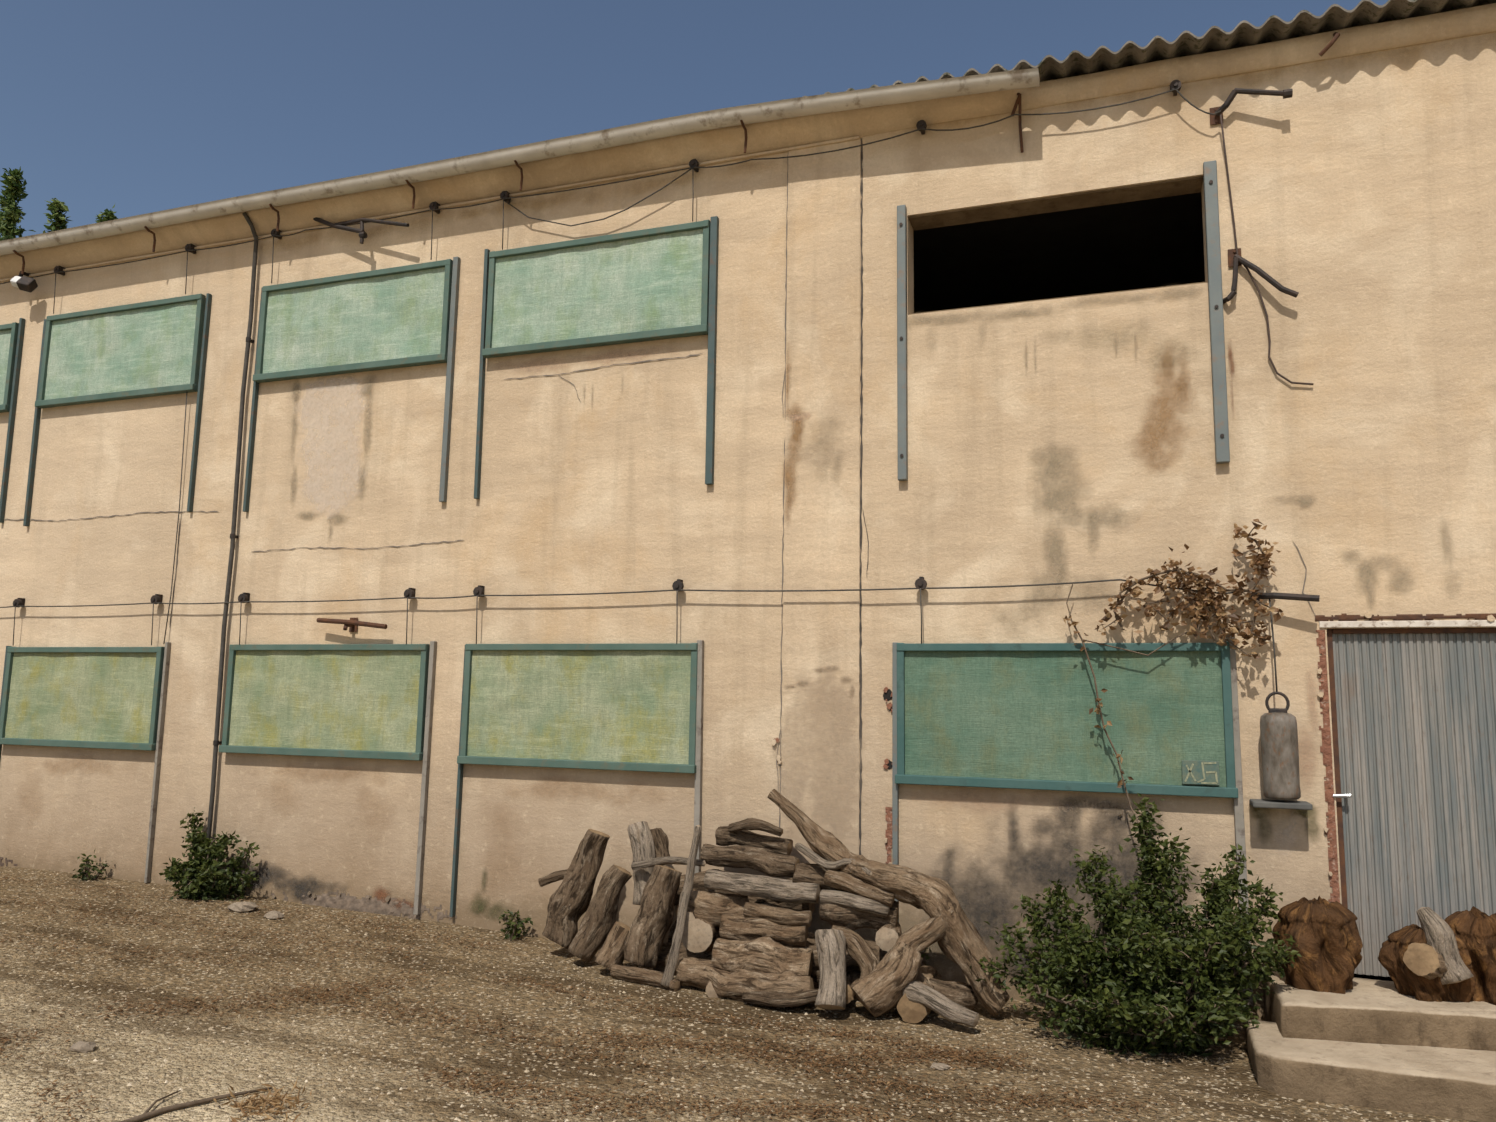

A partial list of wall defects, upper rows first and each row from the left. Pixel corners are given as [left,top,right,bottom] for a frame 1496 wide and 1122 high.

damp [785,410,802,499]
flaking render [1315,611,1496,903]